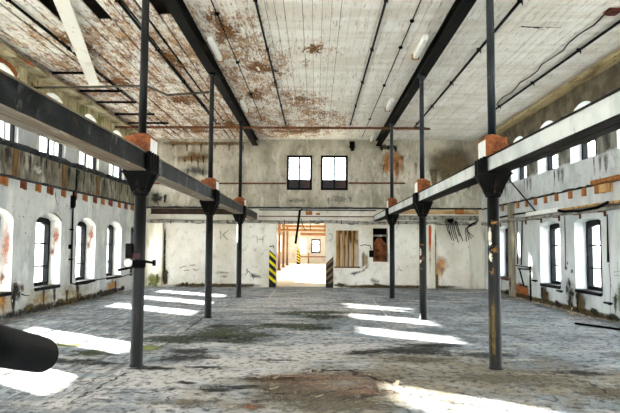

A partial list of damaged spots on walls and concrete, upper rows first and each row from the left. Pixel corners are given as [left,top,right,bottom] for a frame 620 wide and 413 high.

peeling [202,12,241,47]
peeling [153,47,191,71]
peeling [239,62,283,75]
peeling [302,44,325,57]
peeling [163,96,202,108]
water stain [431,148,472,185]
water stain [0,285,124,319]
water stain [501,286,620,322]